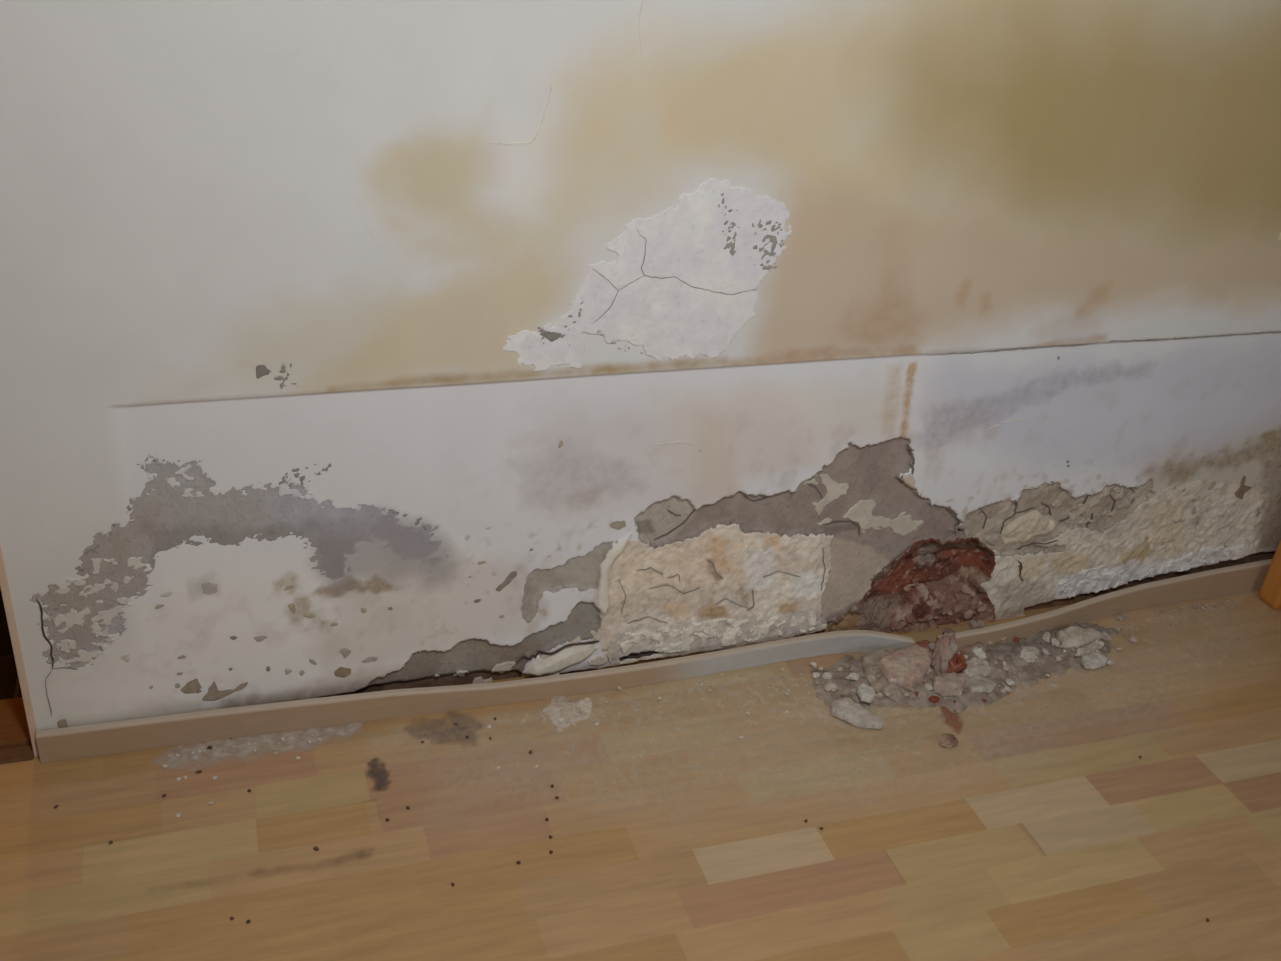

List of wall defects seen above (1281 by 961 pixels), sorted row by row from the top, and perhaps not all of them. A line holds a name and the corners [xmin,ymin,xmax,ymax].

damp [128,0,1281,406]
peeling [503,178,792,372]
crack [591,228,757,324]
peeling [1234,476,1252,499]
peeling [30,455,449,668]
flaking render [355,437,1156,696]
crack [36,599,78,717]
peeling [175,655,248,701]
peeling [334,648,378,678]